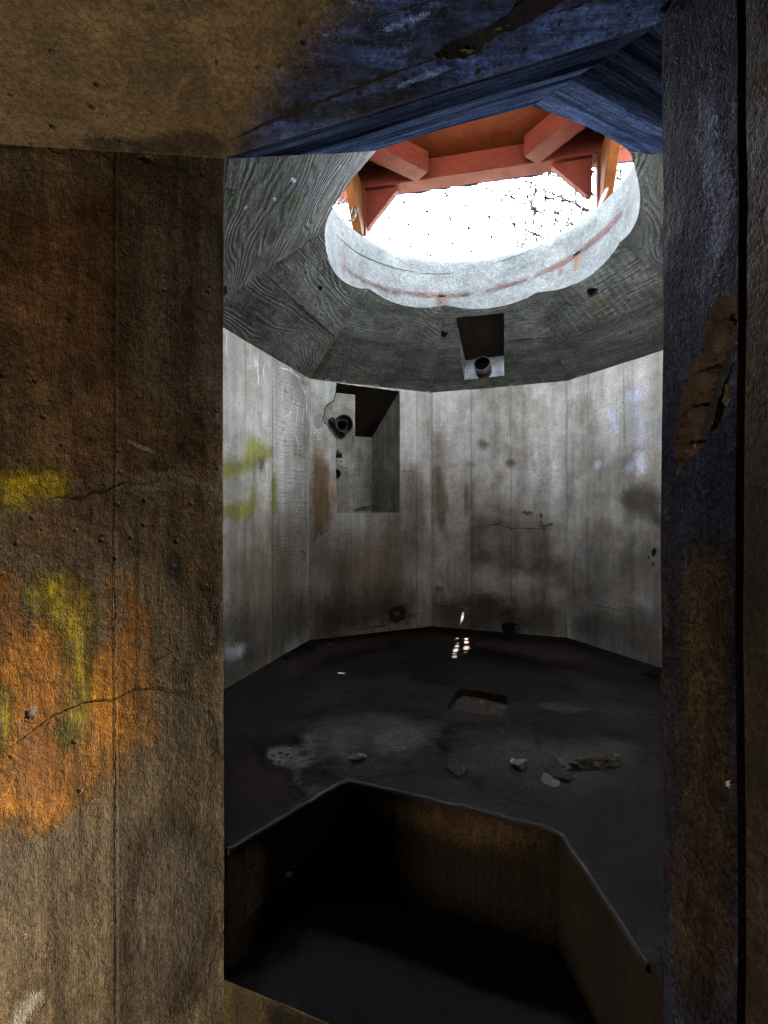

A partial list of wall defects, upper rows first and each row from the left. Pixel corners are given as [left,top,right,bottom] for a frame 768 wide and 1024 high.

spalling [674,294,738,475]
corrosion [309,434,337,543]
crack [1,676,213,753]